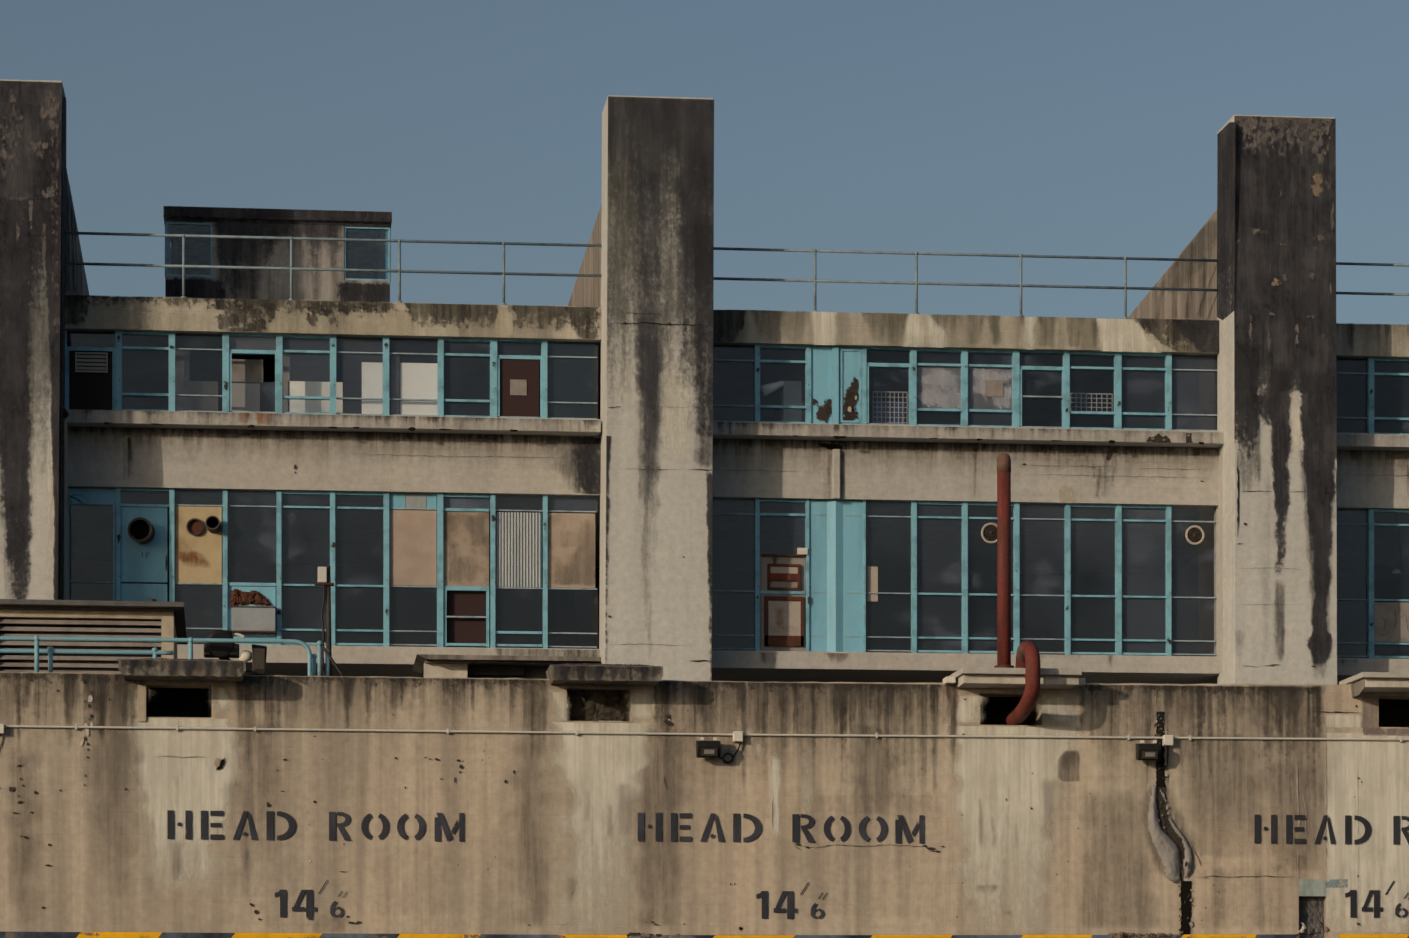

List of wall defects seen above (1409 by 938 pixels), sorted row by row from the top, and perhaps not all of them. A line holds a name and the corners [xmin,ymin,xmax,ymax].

peeling [808,377,859,450]
water stain [1094,116,1409,665]
spalling [627,921,695,938]
water stain [1085,684,1409,932]
crack [1154,691,1361,938]